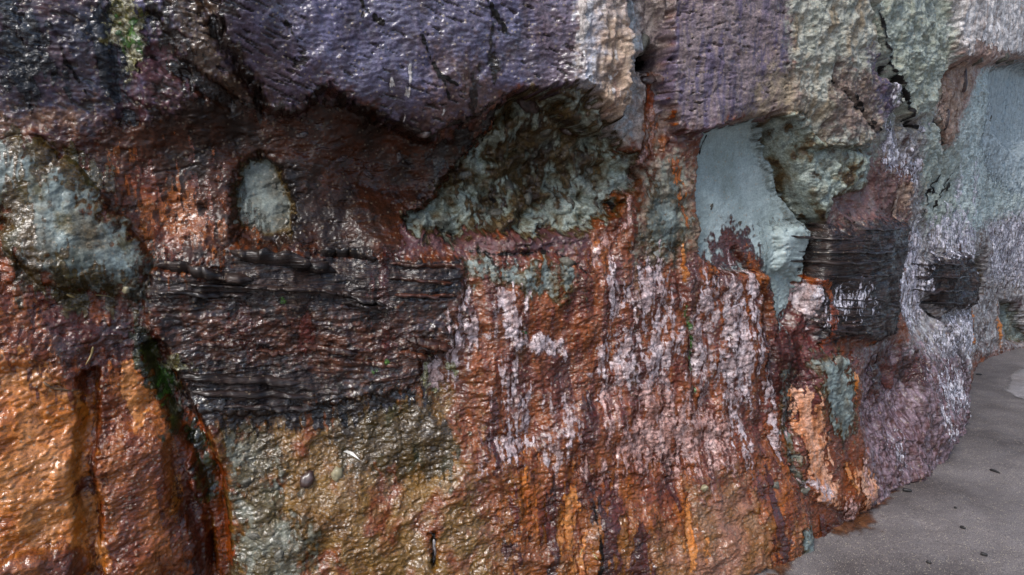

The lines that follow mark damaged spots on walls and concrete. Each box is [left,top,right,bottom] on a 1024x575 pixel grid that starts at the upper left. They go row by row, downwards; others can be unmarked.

crack [831,5,944,145]
spalling [937,0,1024,202]
corrosion [5,245,236,575]
damp [224,303,263,364]
damp [180,380,430,439]
damp [366,245,407,359]
spalling [88,78,822,333]
corrosion [478,390,712,575]
damp [442,239,787,501]
corrosion [702,215,900,575]